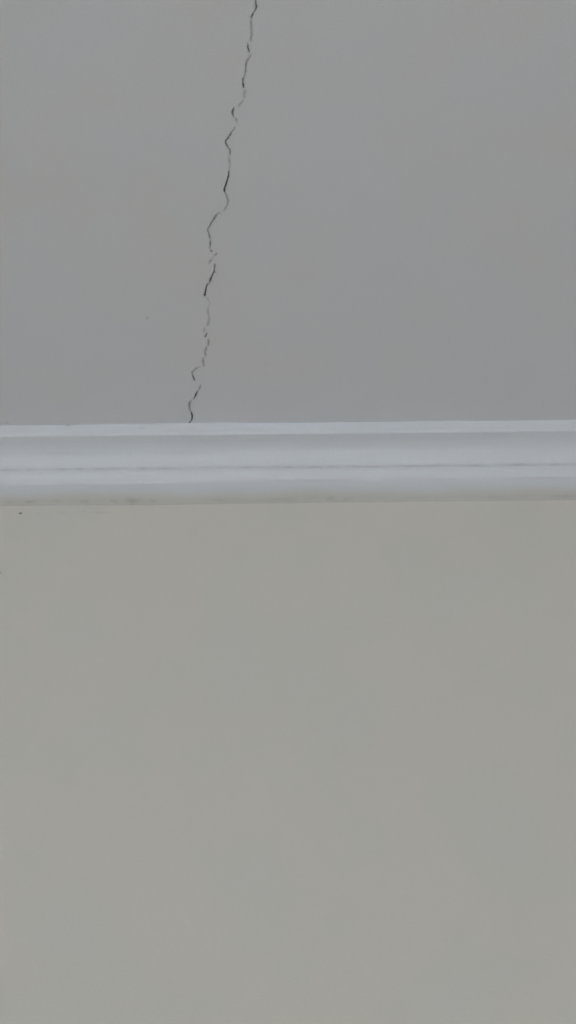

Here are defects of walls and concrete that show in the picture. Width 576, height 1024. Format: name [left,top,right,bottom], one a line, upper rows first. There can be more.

crack [222,80,244,192]
crack [202,218,215,296]
crack [188,376,197,423]